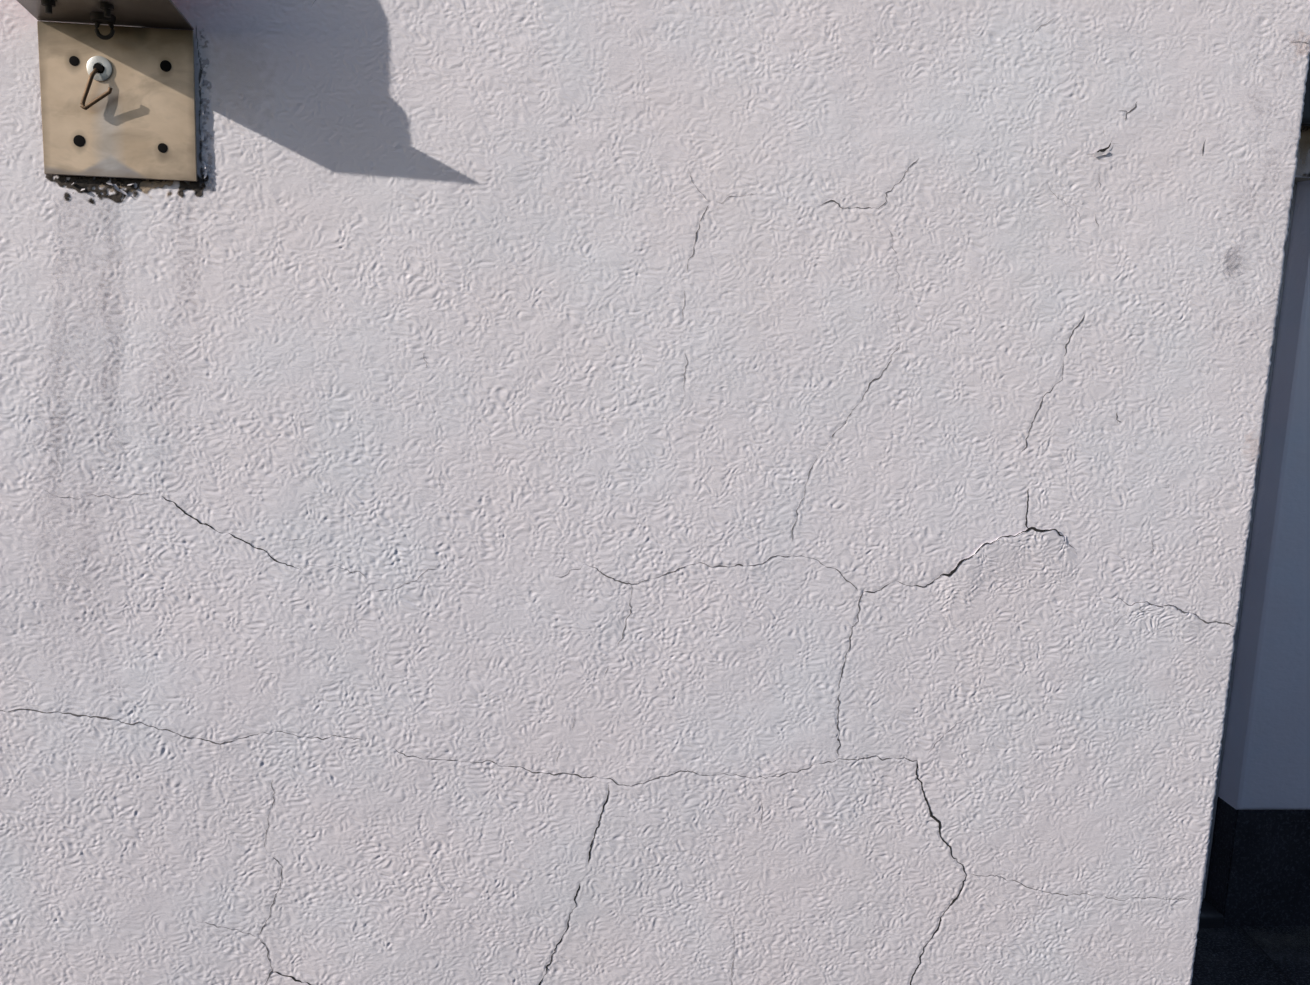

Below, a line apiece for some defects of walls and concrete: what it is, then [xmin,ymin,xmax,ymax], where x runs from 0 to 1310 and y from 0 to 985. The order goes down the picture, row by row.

crack [45,490,428,592]
crack [395,161,1184,985]
crack [1114,597,1233,627]
crack [0,709,362,748]
crack [205,780,311,985]